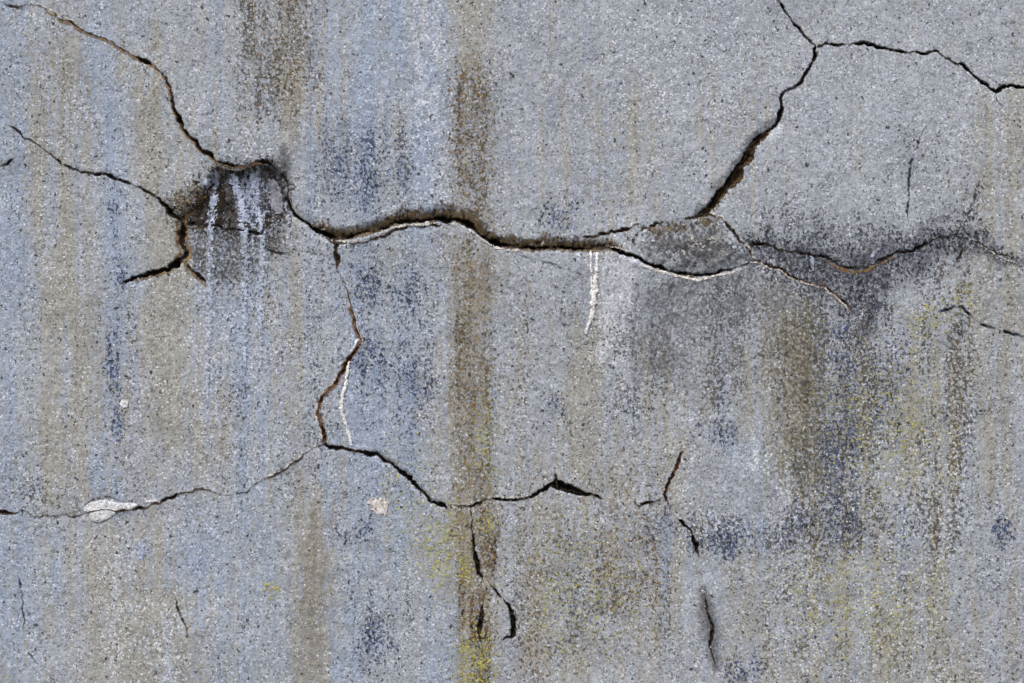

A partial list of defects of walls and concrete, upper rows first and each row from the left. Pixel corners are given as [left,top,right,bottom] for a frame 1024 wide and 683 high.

crack [689,0,1024,220]
crack [750,234,1016,274]
crack [0,2,852,643]
water stain [584,180,1024,516]
crack [939,306,1024,337]
water stain [645,503,705,557]
crack [17,574,53,679]
crack [477,597,485,659]
crack [701,589,718,668]